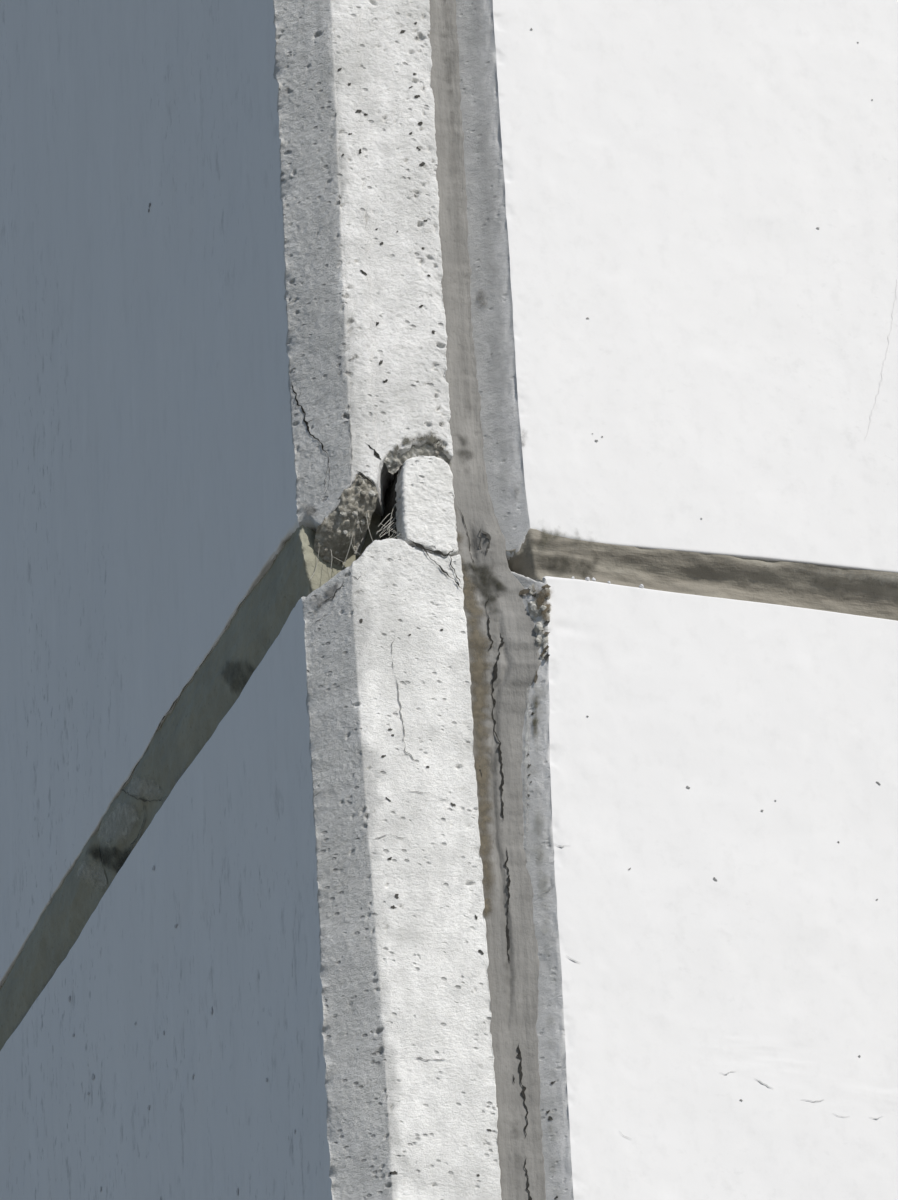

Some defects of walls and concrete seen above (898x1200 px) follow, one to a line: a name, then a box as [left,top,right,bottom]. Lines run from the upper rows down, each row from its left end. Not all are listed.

crack [292,385,381,496]
spalling [383,439,451,474]
spalling [314,473,379,565]
crack [400,537,461,588]